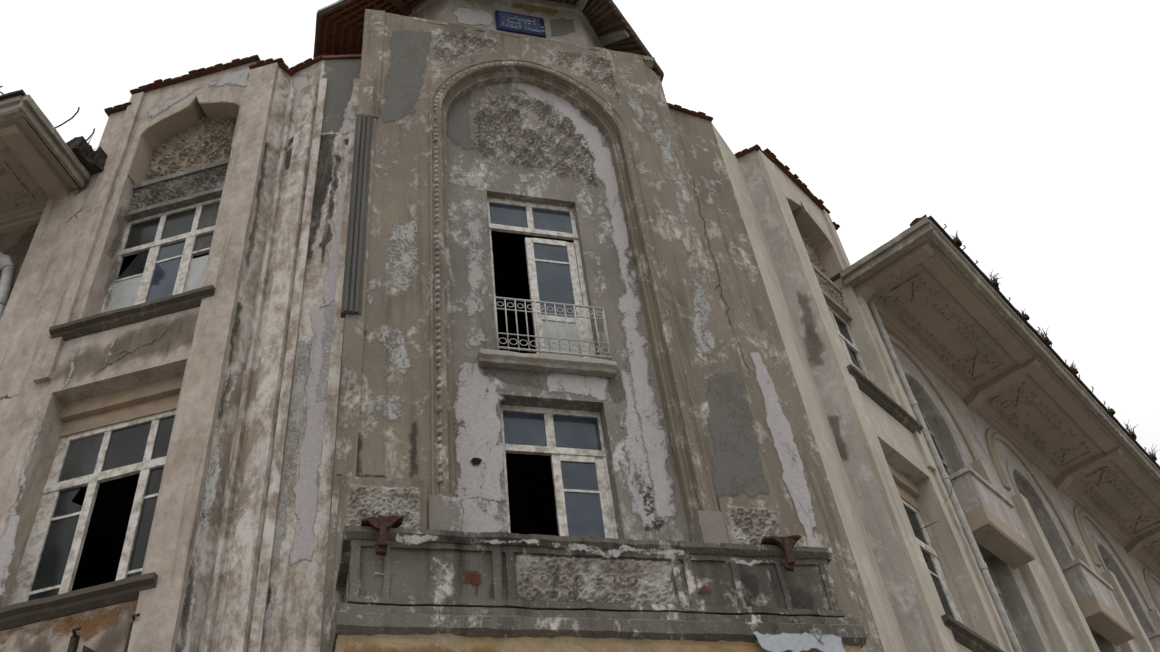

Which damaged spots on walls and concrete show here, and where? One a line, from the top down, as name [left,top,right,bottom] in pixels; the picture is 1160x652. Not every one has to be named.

peeling [0,413,43,600]
peeling [373,389,406,421]
peeling [366,220,420,304]
peeling [379,325,411,374]
peeling [454,153,498,348]
peeling [453,362,506,533]
peeling [516,83,679,530]
peeling [749,352,821,547]
water stain [96,613,133,652]